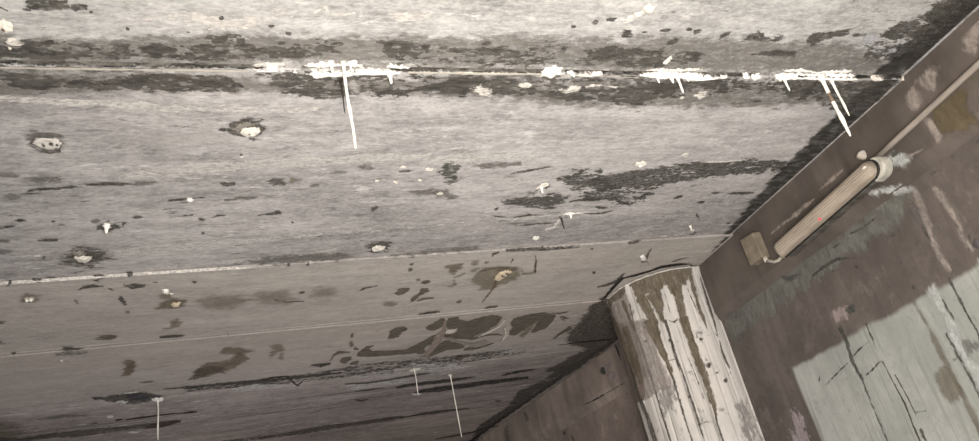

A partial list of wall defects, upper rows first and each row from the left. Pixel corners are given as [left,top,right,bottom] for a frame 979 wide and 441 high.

spalling [471,261,520,301]
peeling [322,312,573,366]
water stain [122,360,136,376]
water stain [189,347,251,380]